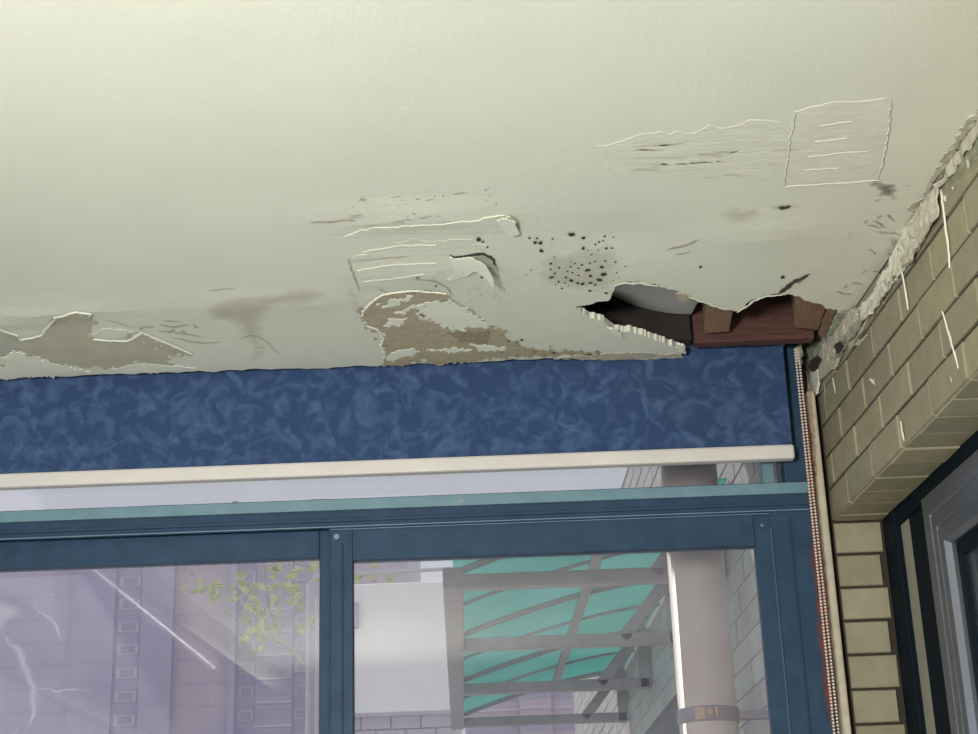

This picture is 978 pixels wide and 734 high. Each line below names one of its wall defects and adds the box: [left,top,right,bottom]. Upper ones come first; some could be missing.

damp [526,233,626,294]
flaking render [795,109,978,396]
peeling [357,237,686,367]
spalling [675,292,782,313]
peeling [0,311,219,380]